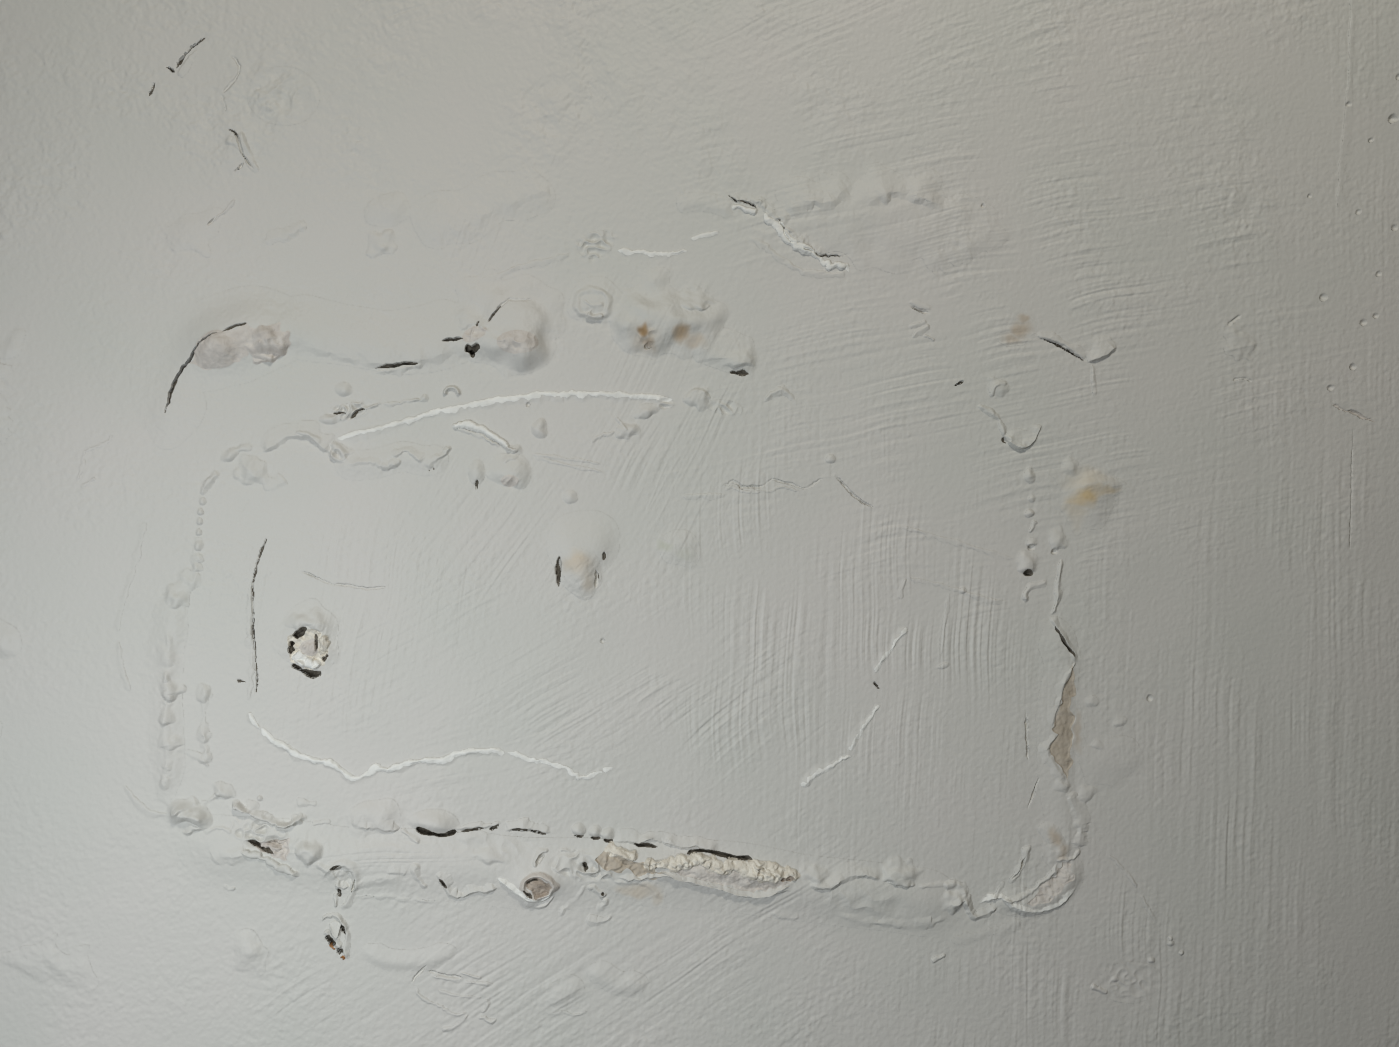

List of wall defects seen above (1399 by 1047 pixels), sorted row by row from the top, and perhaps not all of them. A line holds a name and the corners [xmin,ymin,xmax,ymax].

crack [164,323,246,413]
peeling [165,394,429,609]
peeling [381,446,451,471]
peeling [452,420,522,463]
peeling [979,376,1042,450]
crack [237,539,267,699]
flaking render [1017,468,1078,781]
peeling [157,631,1084,960]